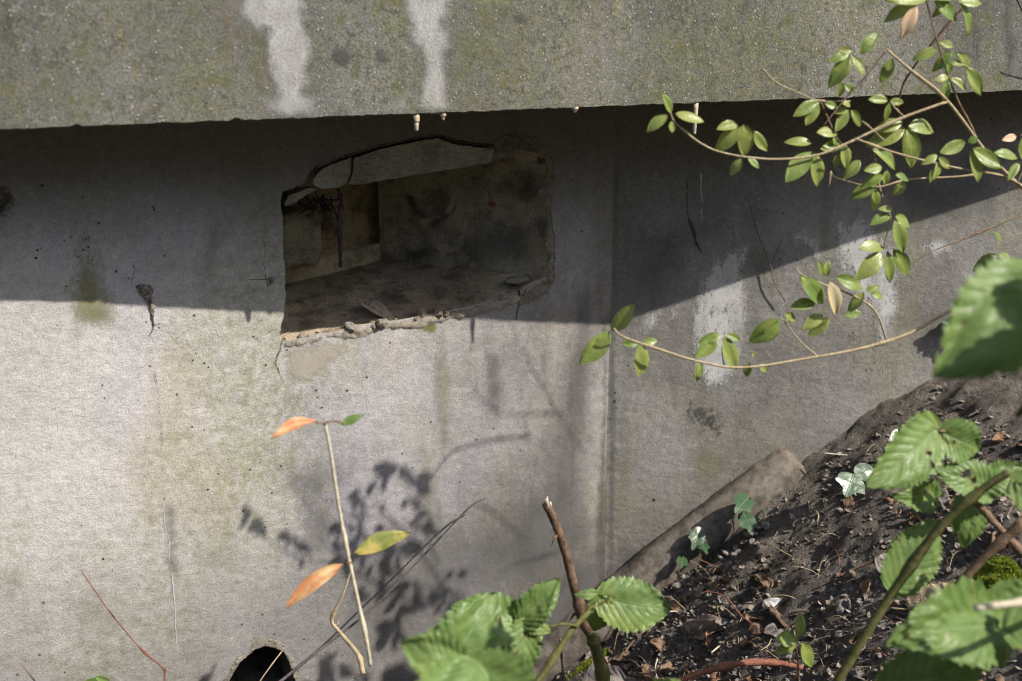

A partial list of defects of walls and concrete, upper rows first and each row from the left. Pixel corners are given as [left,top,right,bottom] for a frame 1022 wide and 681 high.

water stain [243,0,310,114]
water stain [406,0,449,110]
peeling [281,137,494,206]
spalling [285,295,520,347]
spalling [223,636,301,681]